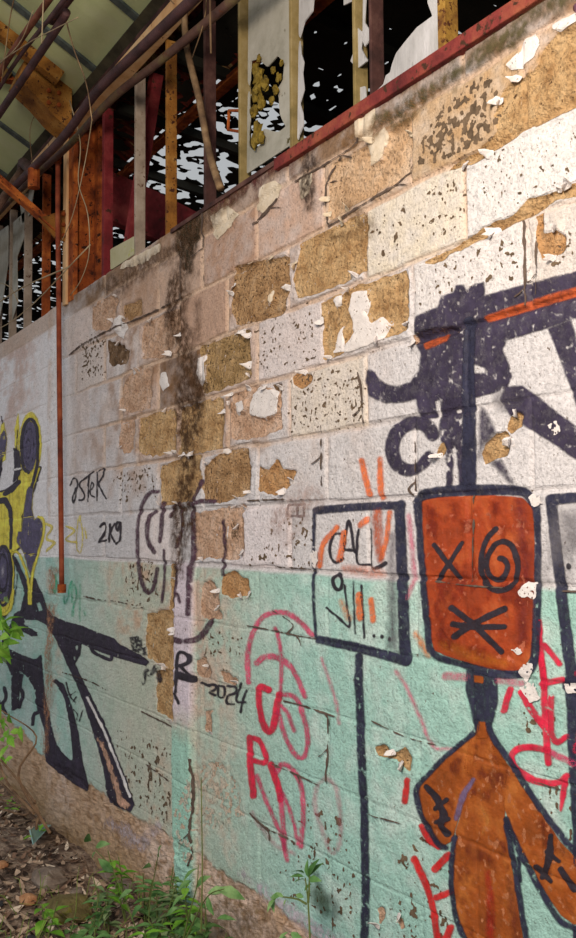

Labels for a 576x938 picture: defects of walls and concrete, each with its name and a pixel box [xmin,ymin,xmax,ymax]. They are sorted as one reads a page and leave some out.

peeling [80,24,576,568]
leakage [165,218,207,572]
peeling [125,561,176,724]
peeling [197,631,243,686]
peeling [201,571,251,620]
peeling [518,581,538,599]